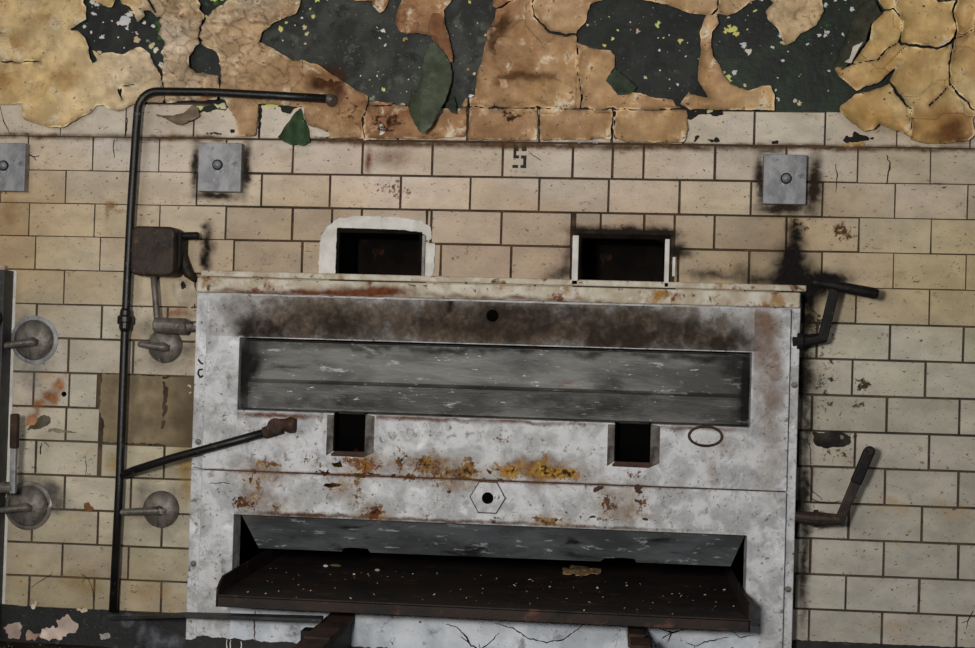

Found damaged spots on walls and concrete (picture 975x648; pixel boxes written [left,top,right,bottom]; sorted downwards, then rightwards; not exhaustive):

peeling [0,0,975,144]
corrosion [236,287,406,297]
corrosion [30,381,63,418]
corrosion [232,460,282,509]
corrosion [268,416,627,529]
peeling [4,608,88,641]
crack [446,623,584,648]